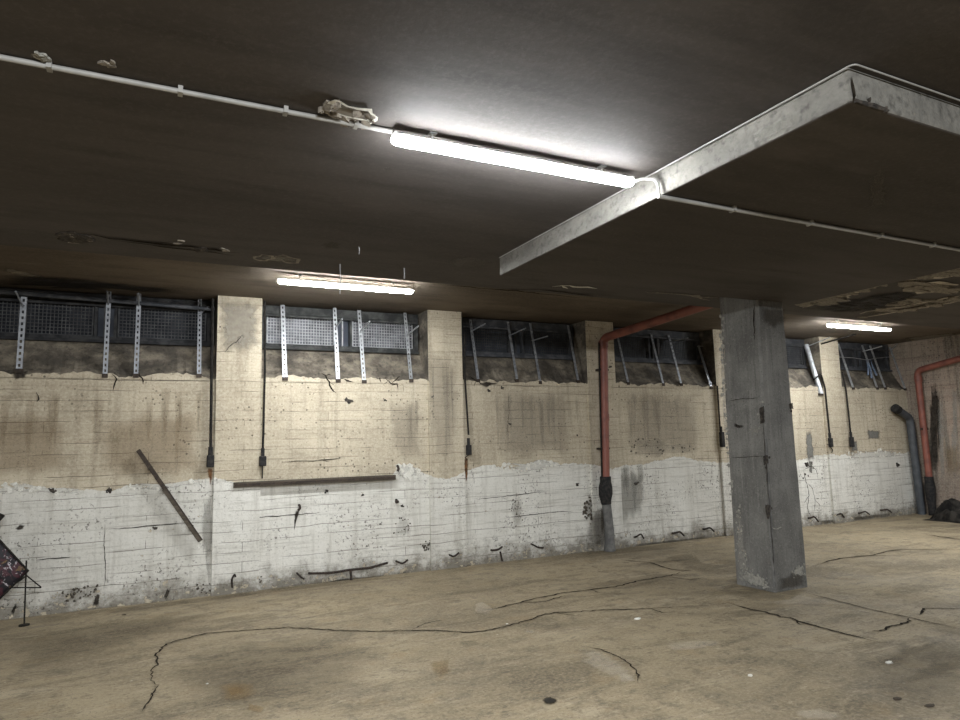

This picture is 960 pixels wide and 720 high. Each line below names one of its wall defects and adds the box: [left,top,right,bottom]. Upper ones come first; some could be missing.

peeling [795,268,960,318]
leakage [930,387,941,469]
crack [817,535,960,565]
crack [142,559,959,711]